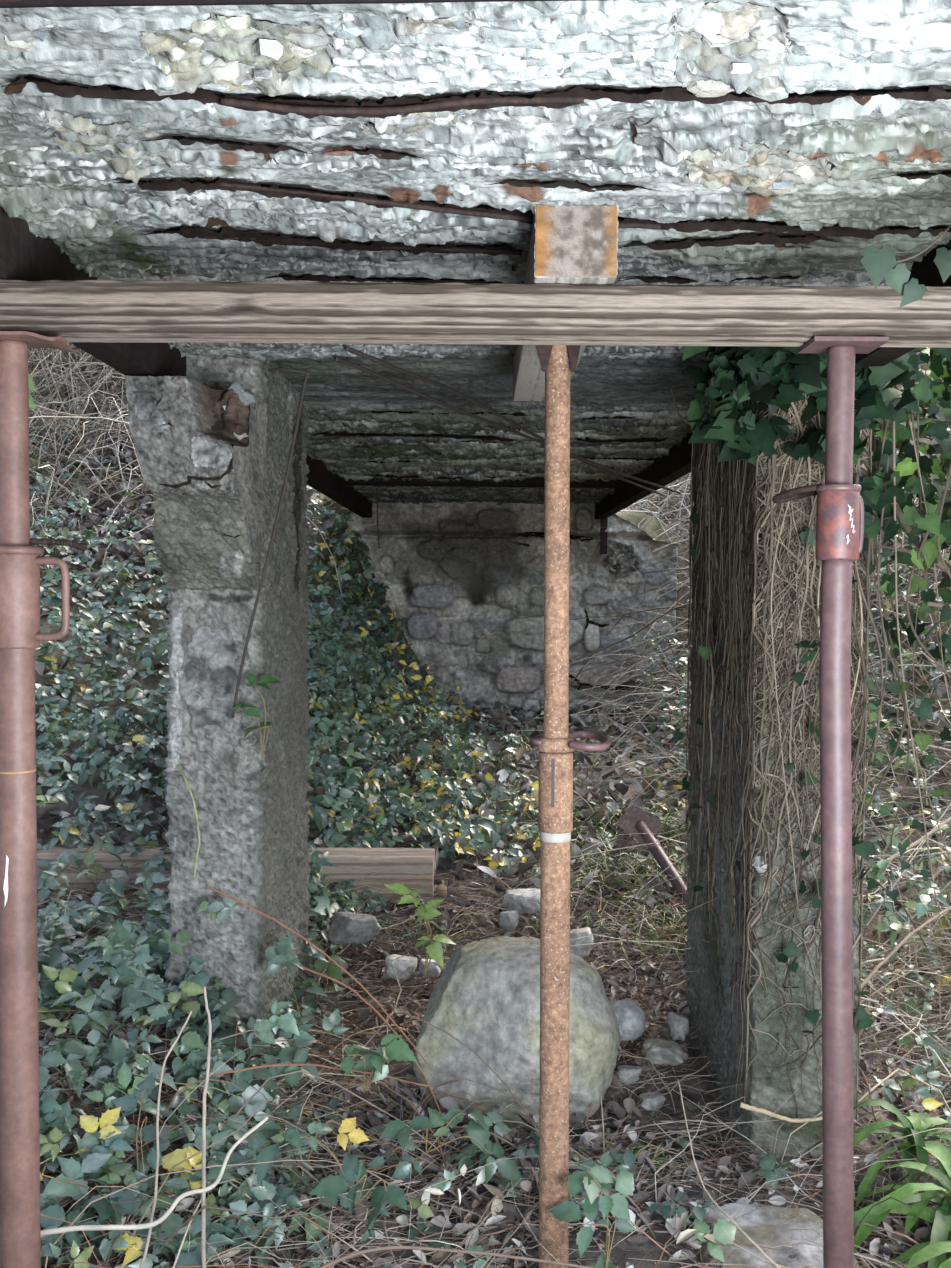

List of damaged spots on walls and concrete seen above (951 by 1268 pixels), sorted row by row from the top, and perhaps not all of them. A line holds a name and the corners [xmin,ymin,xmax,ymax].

spalling [140,12,473,97]
spalling [30,110,187,184]
corrosion [323,146,353,156]
spalling [361,111,459,135]
corrosion [385,184,450,204]
spalling [682,144,835,198]
spalling [191,383,257,470]
crack [155,443,234,488]